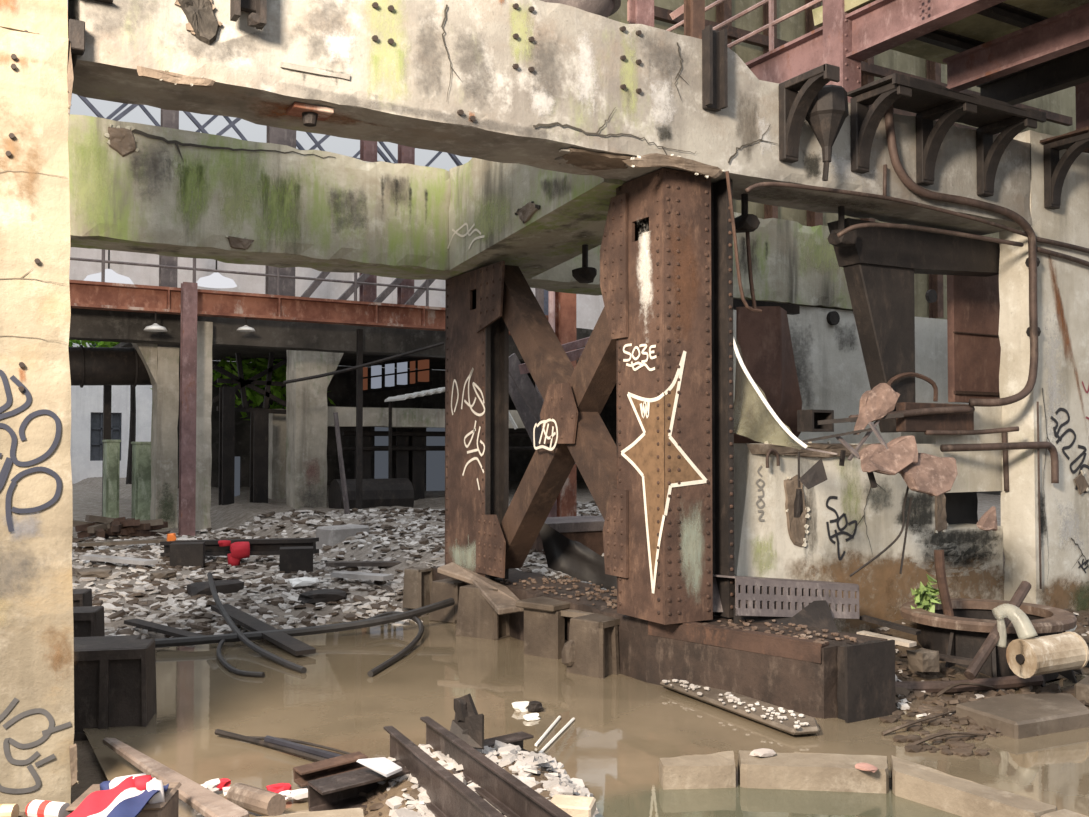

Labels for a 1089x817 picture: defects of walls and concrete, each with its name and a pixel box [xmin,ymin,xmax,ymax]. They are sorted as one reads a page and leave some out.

crack [441,5,461,97]
spalling [104,124,139,157]
crack [533,107,696,155]
crack [728,124,777,163]
damp [382,179,412,200]
damp [637,232,652,303]
rust [1052,271,1070,353]